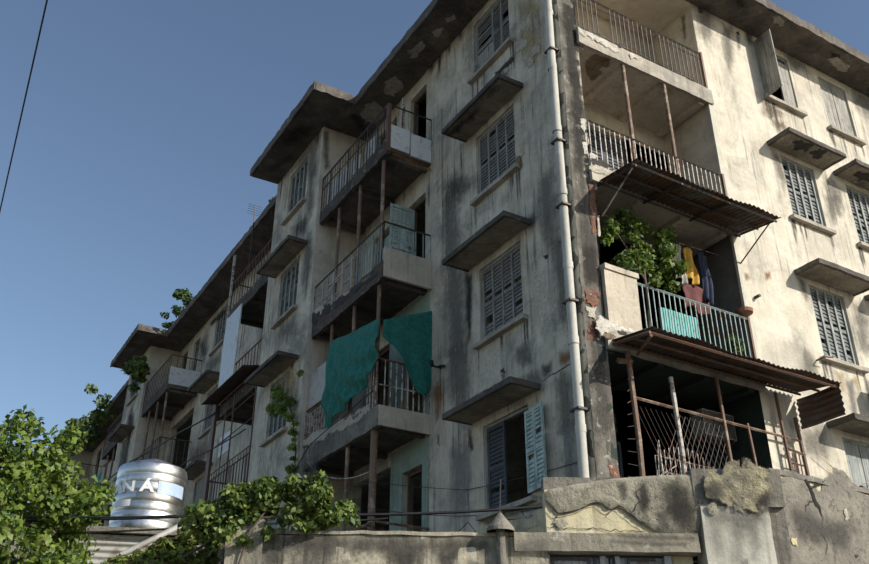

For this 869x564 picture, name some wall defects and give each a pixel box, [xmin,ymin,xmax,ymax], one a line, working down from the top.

water stain [724,28,732,64]
water stain [765,99,785,129]
water stain [856,94,869,113]
water stain [444,178,467,256]
water stain [528,171,565,324]
water stain [827,180,841,219]
water stain [448,267,471,405]
flaking render [583,289,639,340]
spalling [302,403,370,447]
water stain [558,376,577,477]
flaking render [545,462,759,536]
peeling [780,467,869,564]